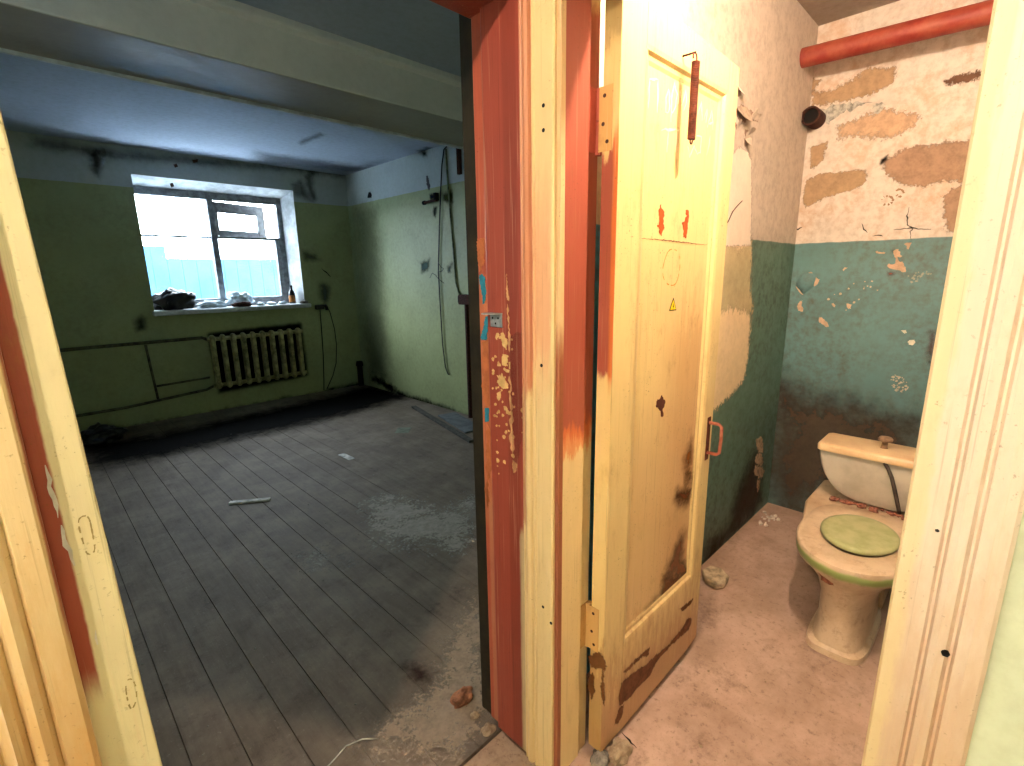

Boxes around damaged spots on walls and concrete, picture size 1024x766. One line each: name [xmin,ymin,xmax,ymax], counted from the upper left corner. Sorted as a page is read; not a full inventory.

peeling [735,84,763,147]
spalling [821,101,886,124]
crack [862,210,927,238]
peeling [875,241,913,272]
peeling [477,238,518,508]
spalling [754,436,765,490]
damp [706,380,920,560]